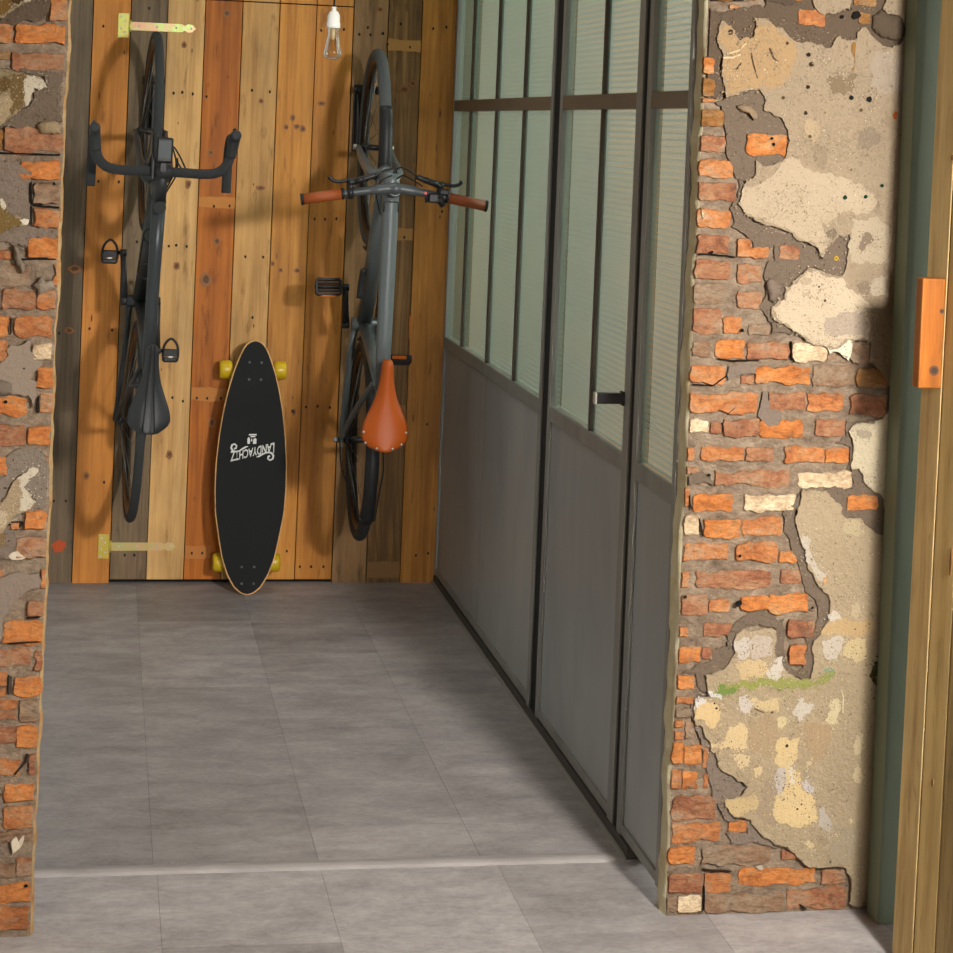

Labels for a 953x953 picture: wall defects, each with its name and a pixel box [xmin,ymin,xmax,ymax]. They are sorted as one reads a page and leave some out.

spalling [0,0,51,26]
spalling [0,68,63,129]
spalling [0,160,57,247]
spalling [0,339,43,408]
peeling [682,0,907,907]
spalling [0,448,48,641]
flaking render [10,835,24,854]